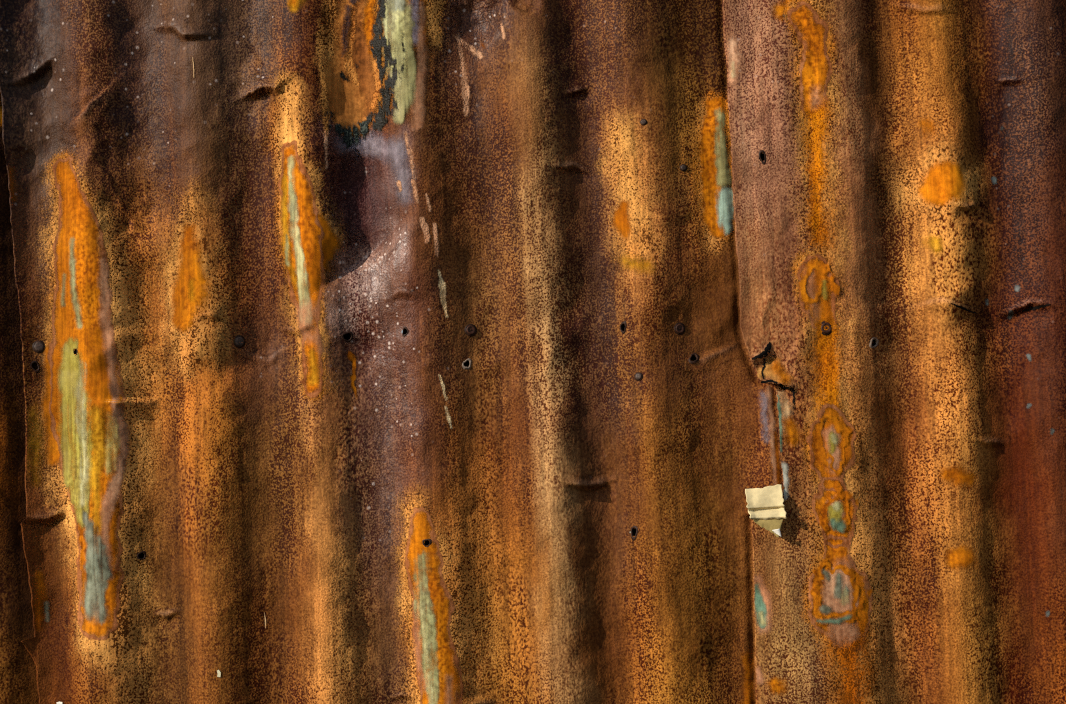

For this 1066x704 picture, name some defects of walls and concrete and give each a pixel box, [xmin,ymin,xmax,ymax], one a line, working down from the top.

corrosion [729,39,740,84]
corrosion [35,153,158,673]
corrosion [162,186,229,381]
corrosion [271,73,342,399]
corrosion [693,91,733,255]
corrosion [757,0,894,704]
corrosion [397,486,476,704]
corrosion [744,654,783,704]